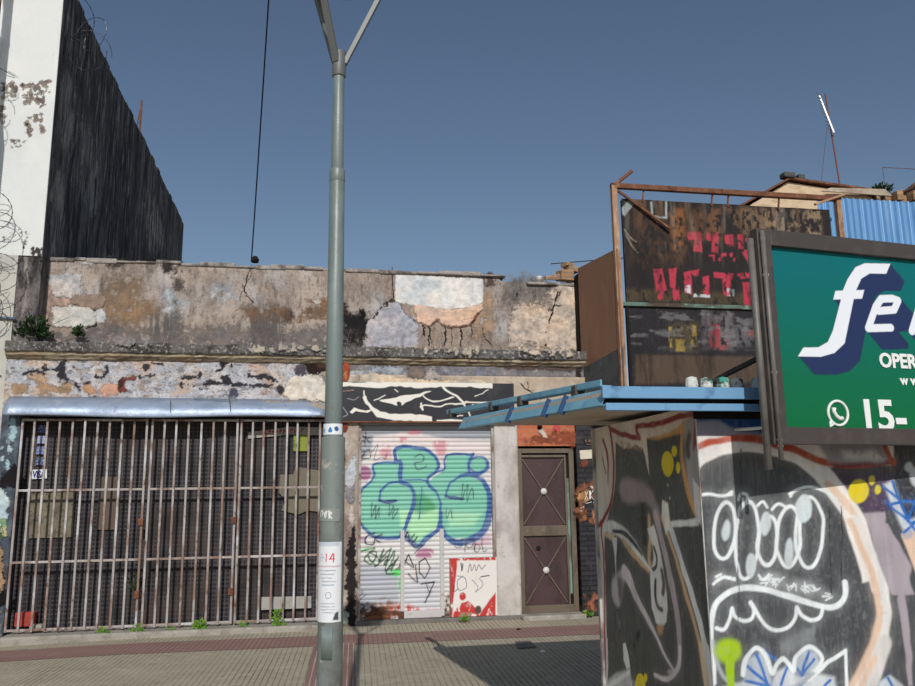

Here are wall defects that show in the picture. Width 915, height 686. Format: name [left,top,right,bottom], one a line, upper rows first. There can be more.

peeling [0,79,52,148]
peeling [11,360,126,397]
leakage [43,261,327,347]
peeling [180,362,297,403]
flaking render [249,341,326,353]
peeling [294,364,326,381]
flaking render [343,362,500,383]
flaking render [363,300,483,358]
crack [372,267,493,346]
peeling [0,418,22,539]